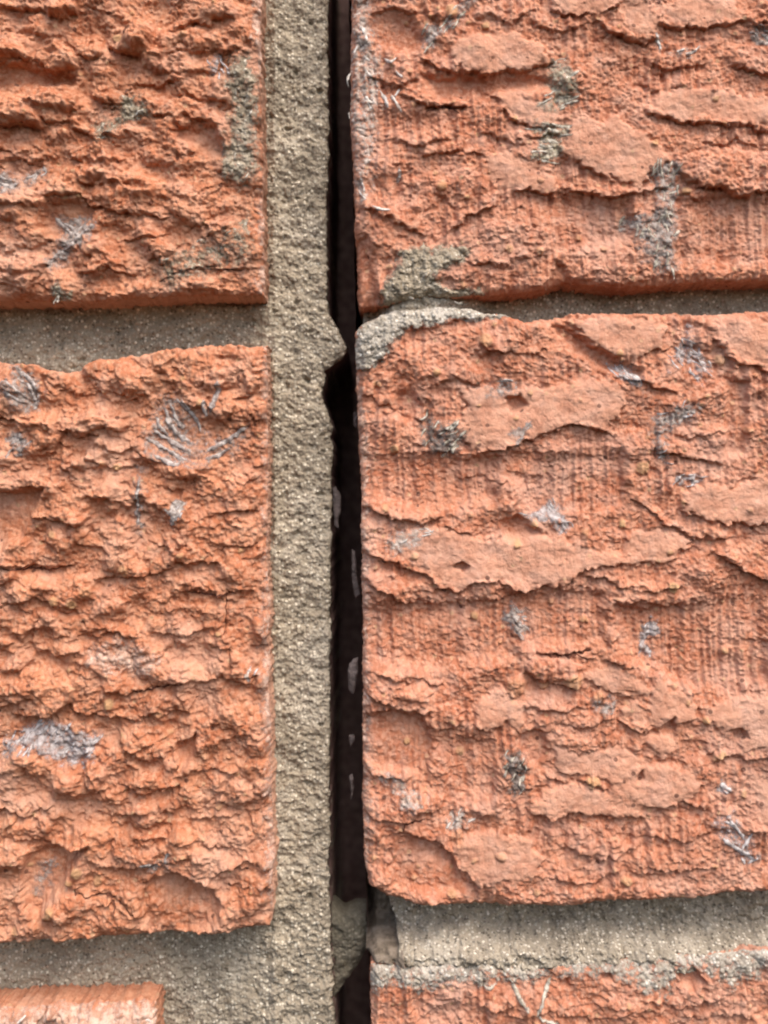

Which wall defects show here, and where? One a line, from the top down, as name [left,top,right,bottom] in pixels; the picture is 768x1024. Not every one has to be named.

crack [322,0,426,1024]